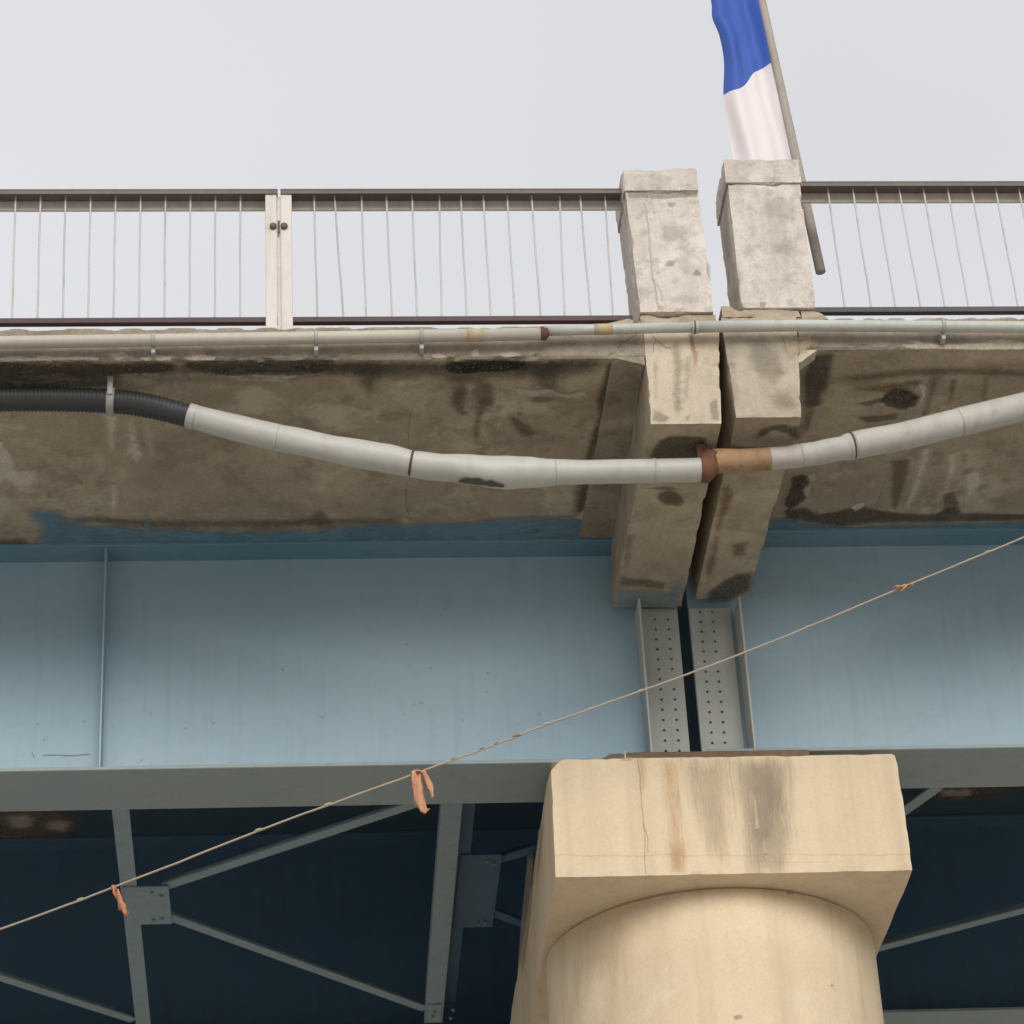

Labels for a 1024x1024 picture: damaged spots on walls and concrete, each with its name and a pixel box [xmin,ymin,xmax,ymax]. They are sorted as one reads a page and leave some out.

leakage [806,355,831,406]
leakage [787,449,1024,529]
leakage [709,575,750,602]